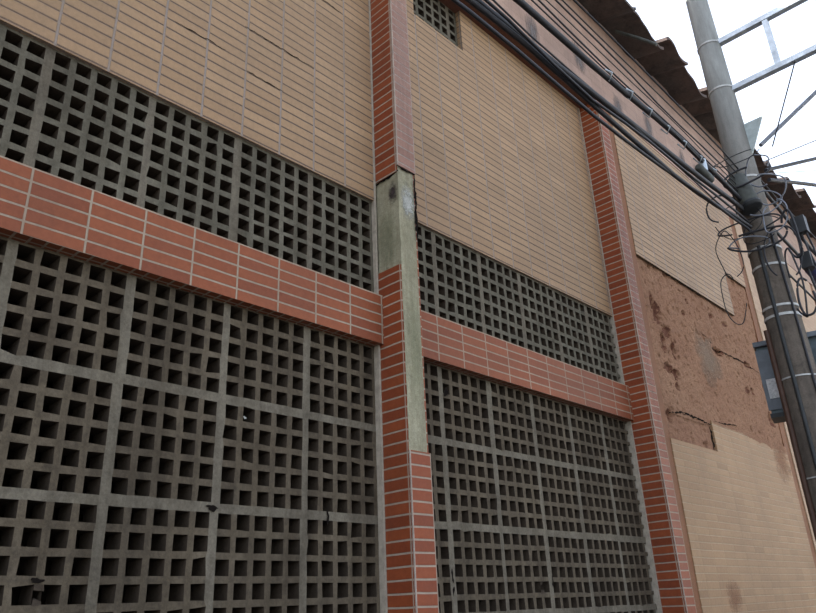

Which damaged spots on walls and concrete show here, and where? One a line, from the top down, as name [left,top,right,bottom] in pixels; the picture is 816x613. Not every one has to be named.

crack [665,411,736,449]
peeling [636,255,787,454]